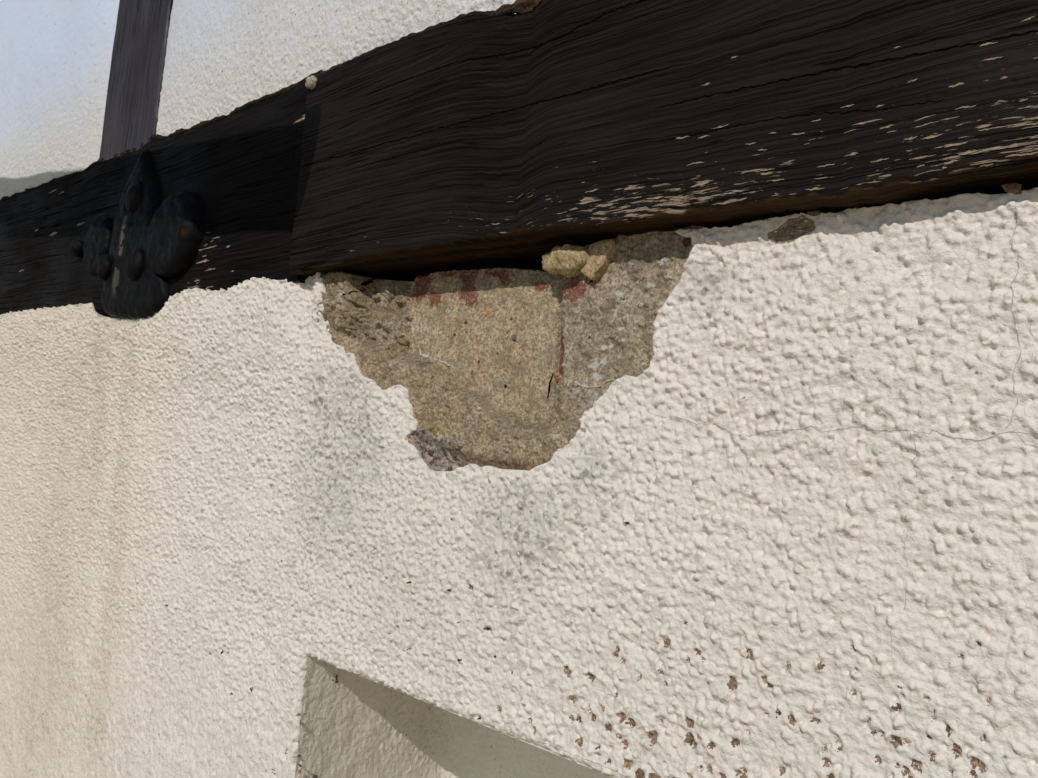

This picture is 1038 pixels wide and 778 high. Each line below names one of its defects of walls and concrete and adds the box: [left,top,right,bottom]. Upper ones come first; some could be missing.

spalling [314,225,704,471]
crack [643,194,1038,477]